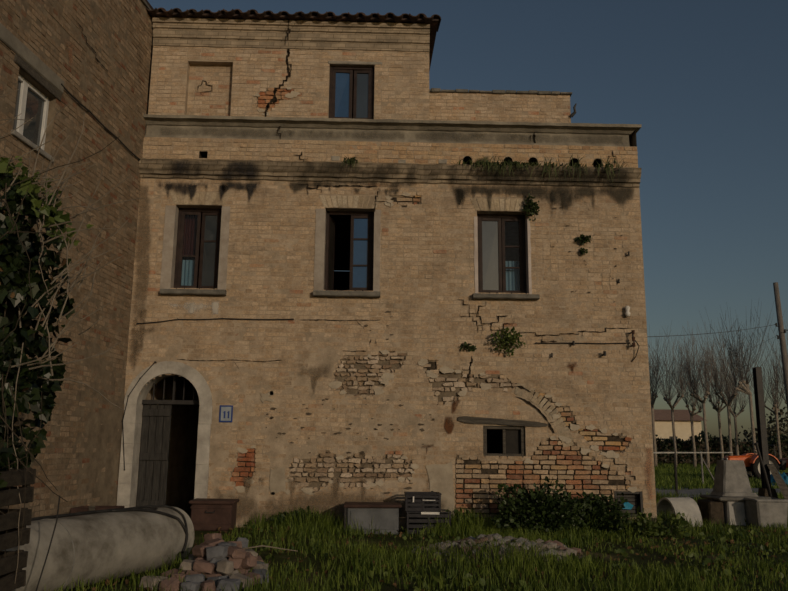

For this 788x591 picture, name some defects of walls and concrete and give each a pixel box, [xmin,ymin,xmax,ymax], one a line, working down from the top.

spalling [254,87,300,116]
crack [264,19,292,139]
leakage [160,161,199,199]
leakage [219,162,257,200]
crack [297,184,391,212]
spalling [328,311,406,405]
spalling [418,358,517,406]
spalling [230,445,256,493]
spalling [285,451,419,495]
spalling [455,392,637,522]